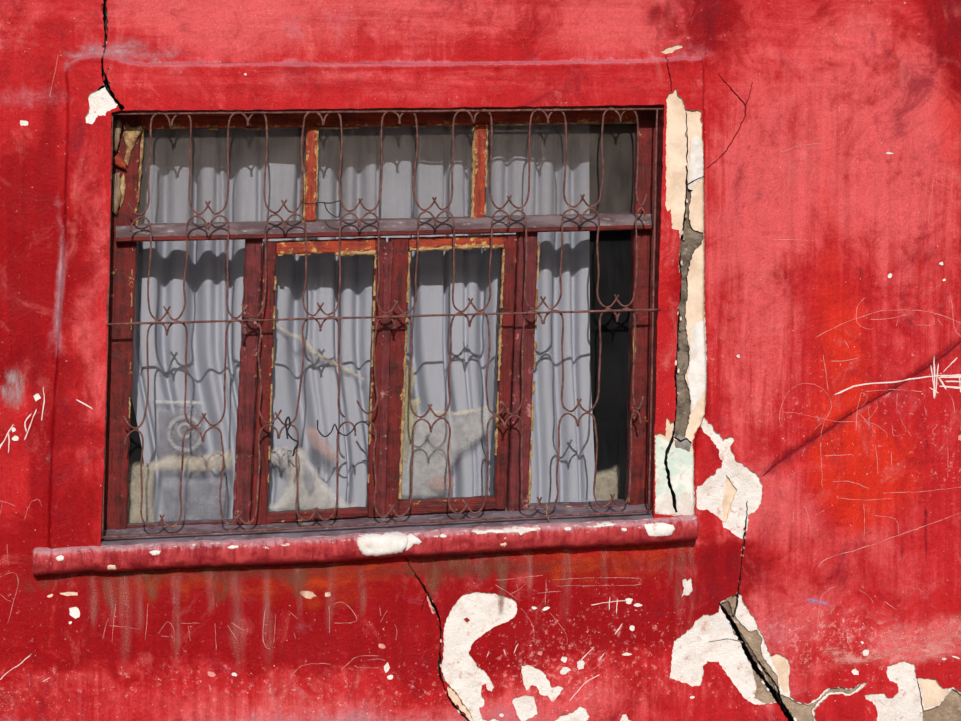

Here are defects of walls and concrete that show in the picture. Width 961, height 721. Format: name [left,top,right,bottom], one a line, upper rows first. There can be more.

peeling [85,87,117,124]
crack [97,0,125,111]
peeling [688,135,704,190]
crack [664,74,753,513]
peeling [687,320,707,411]
peeling [644,416,763,539]
spalling [357,532,421,556]
crack [405,557,470,721]
peeling [442,592,518,721]
peeling [512,657,590,721]
crack [709,501,797,721]
peeling [670,594,961,721]